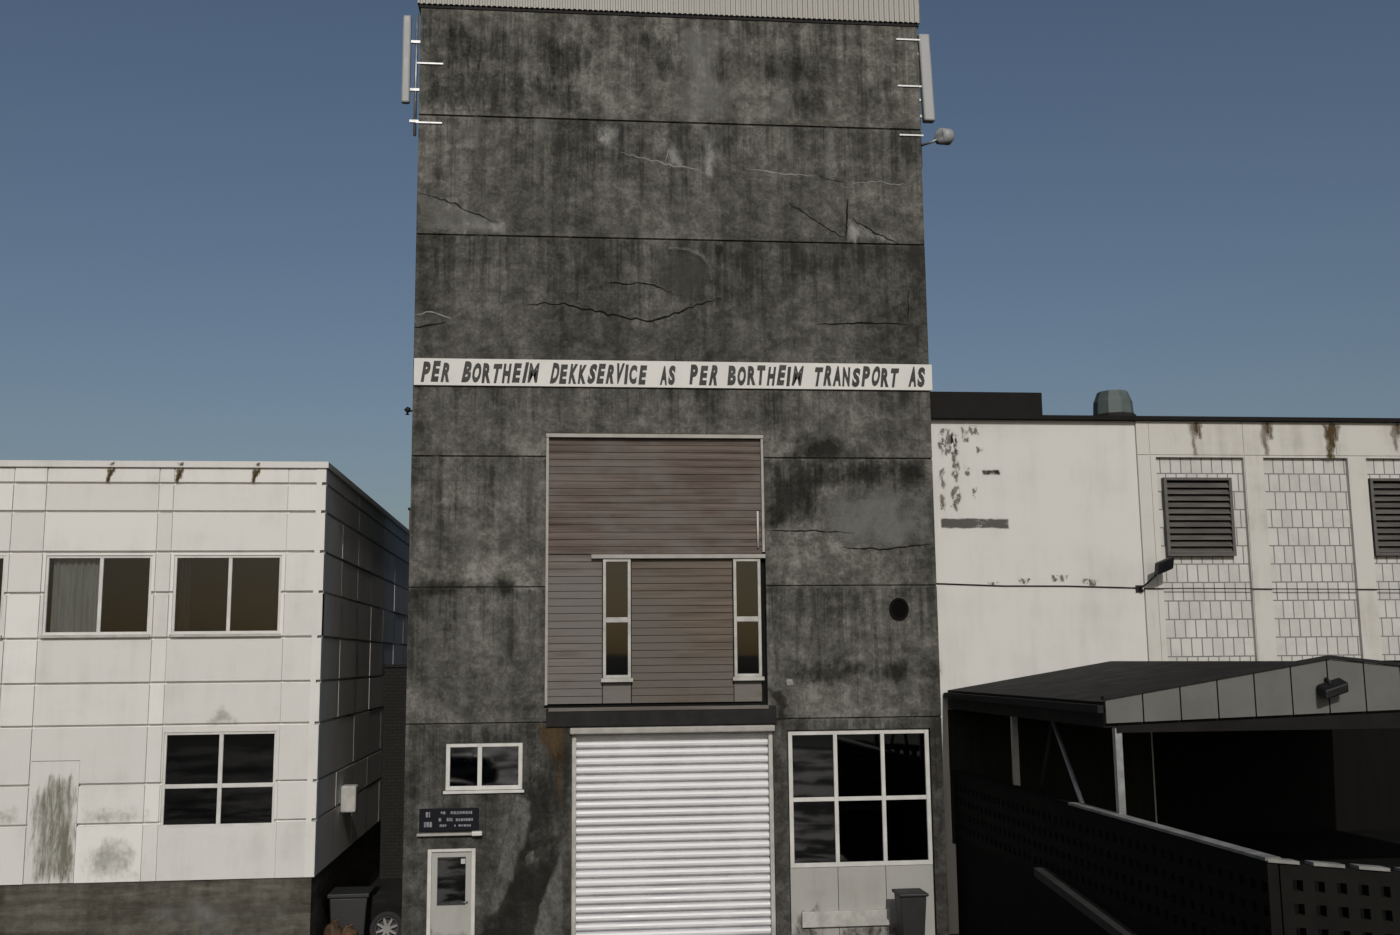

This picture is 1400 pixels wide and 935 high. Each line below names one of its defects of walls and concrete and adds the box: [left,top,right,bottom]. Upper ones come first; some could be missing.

crack [418,192,501,225]
crack [747,168,911,244]
crack [528,282,718,322]
corrosion [1323,424,1339,459]
peeling [938,427,1009,528]
crack [766,529,930,550]